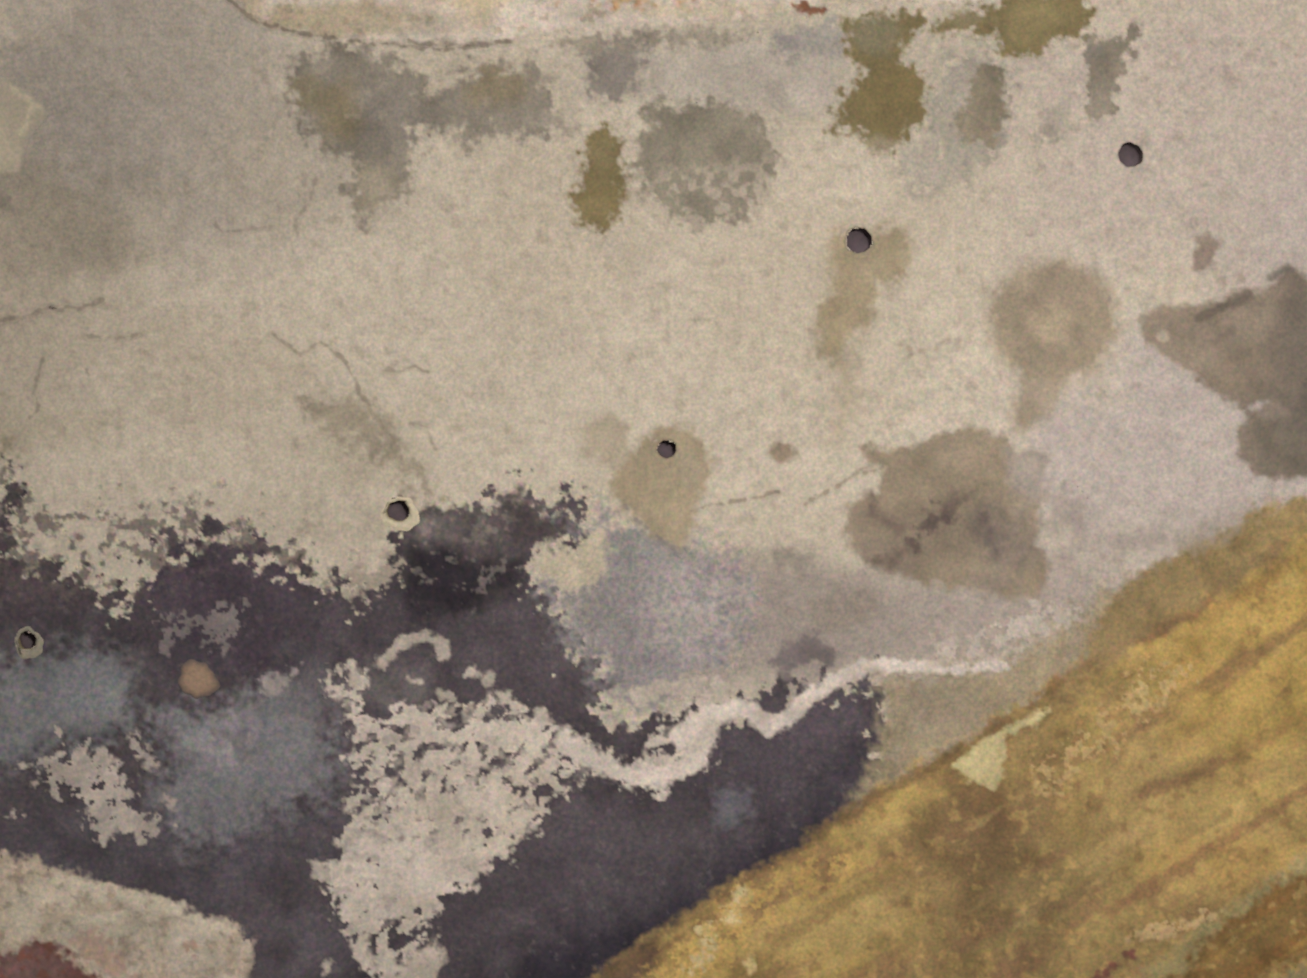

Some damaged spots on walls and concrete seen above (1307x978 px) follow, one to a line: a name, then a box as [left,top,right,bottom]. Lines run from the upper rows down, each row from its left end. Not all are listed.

rust [552,0,715,15]
damp [268,0,1307,605]
damp [764,626,845,685]
damp [0,919,141,978]
spalling [0,847,259,978]
peeling [1123,906,1232,951]